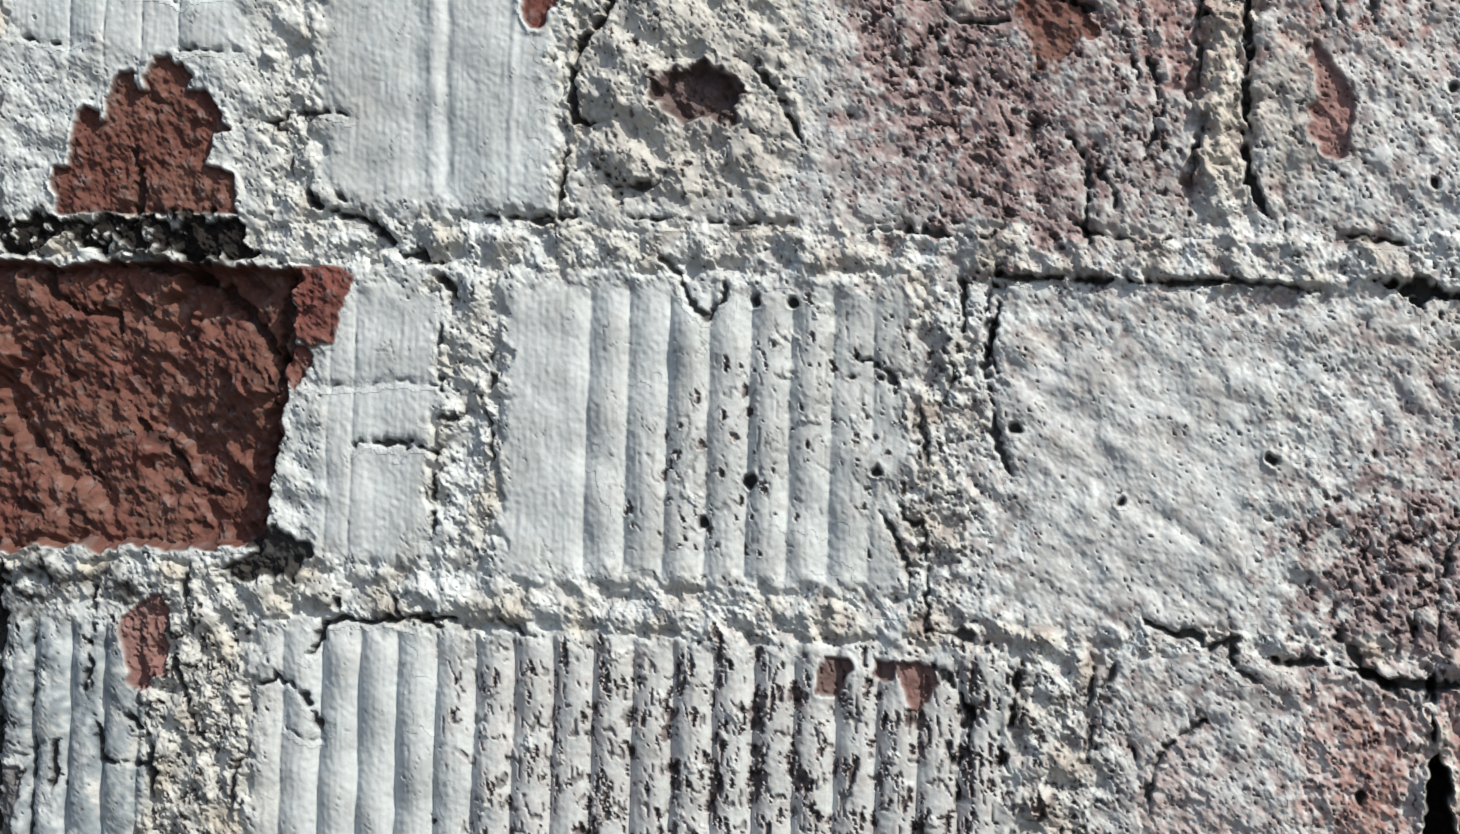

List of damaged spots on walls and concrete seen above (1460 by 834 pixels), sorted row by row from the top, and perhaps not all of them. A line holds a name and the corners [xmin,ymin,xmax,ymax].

crack [7,18,96,53]
crack [0,403,118,499]
peeling [45,49,243,221]
spalling [0,253,362,834]
crack [0,553,547,834]
crack [29,0,812,557]
peeling [400,0,1460,834]
crack [844,0,1460,834]